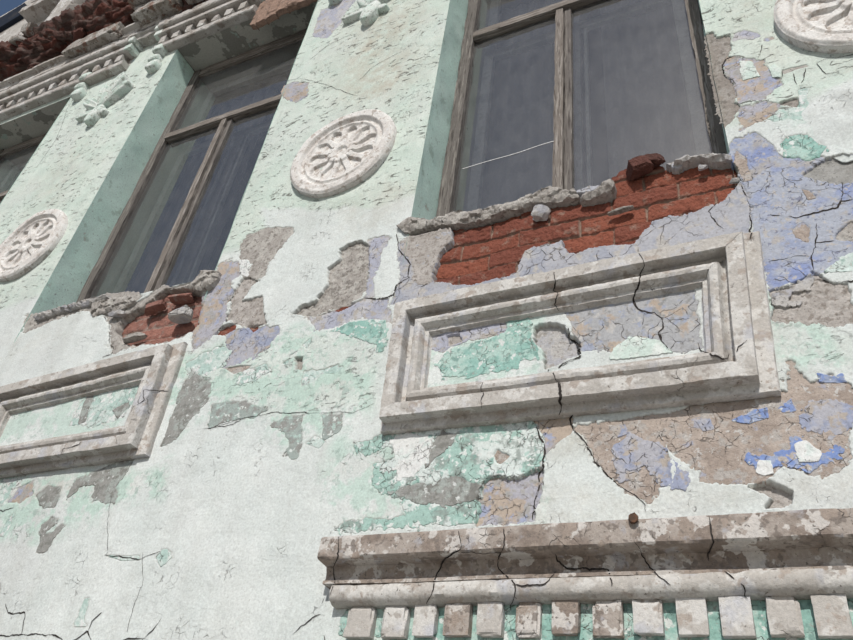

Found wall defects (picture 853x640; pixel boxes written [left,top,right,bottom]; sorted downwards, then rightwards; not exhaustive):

spalling [250,0,318,31]
spalling [297,30,853,356]
crack [741,183,853,283]
spalling [23,227,294,386]
peeling [432,290,703,380]
crack [532,427,546,520]
peeling [335,360,853,535]
crack [548,328,646,511]
peeling [36,516,65,554]
crack [107,501,159,640]
crack [426,524,613,610]
crack [0,604,102,640]